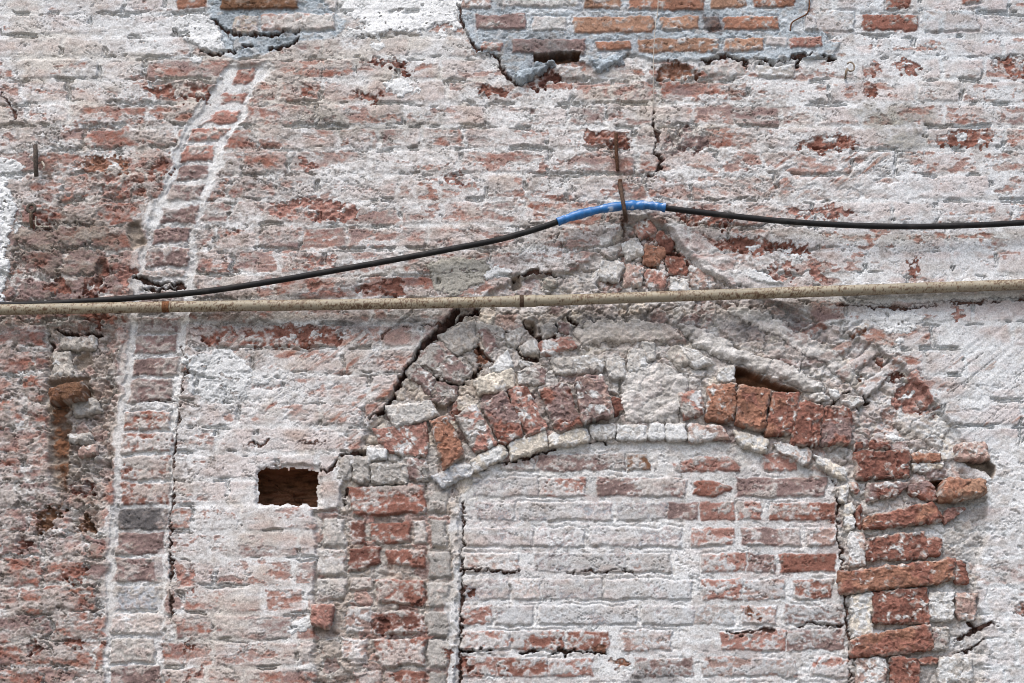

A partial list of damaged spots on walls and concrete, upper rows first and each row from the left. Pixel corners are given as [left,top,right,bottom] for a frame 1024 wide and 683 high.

flaking render [171,11,228,63]
spalling [525,68,562,93]
spalling [651,59,702,83]
crack [647,112,664,178]
crack [149,347,189,468]
crack [370,309,480,420]
crack [436,347,494,386]
spalling [872,354,940,418]
crack [168,494,176,617]
crack [832,480,845,570]